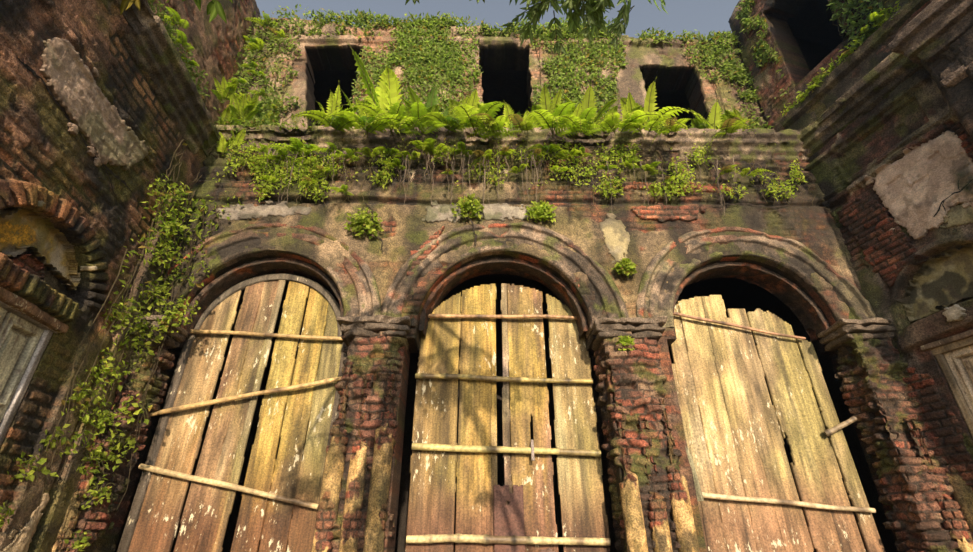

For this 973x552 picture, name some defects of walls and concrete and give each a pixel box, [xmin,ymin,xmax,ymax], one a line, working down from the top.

peeling [39,37,150,170]
peeling [0,201,98,290]
peeling [836,122,973,326]
spalling [902,367,973,485]